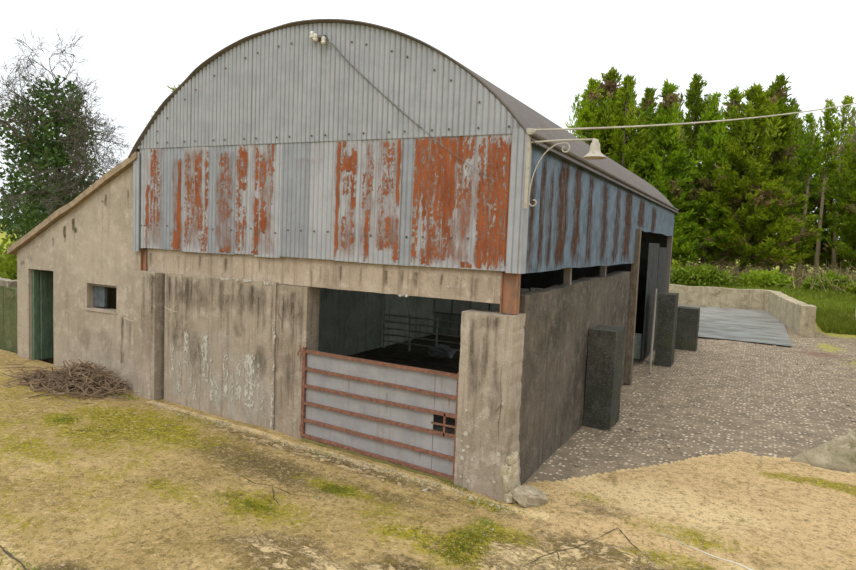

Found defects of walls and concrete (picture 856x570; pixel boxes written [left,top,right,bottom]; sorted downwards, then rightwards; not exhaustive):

rust [145,149,160,248]
rust [170,144,275,255]
rust [334,139,401,262]
rust [411,135,512,270]